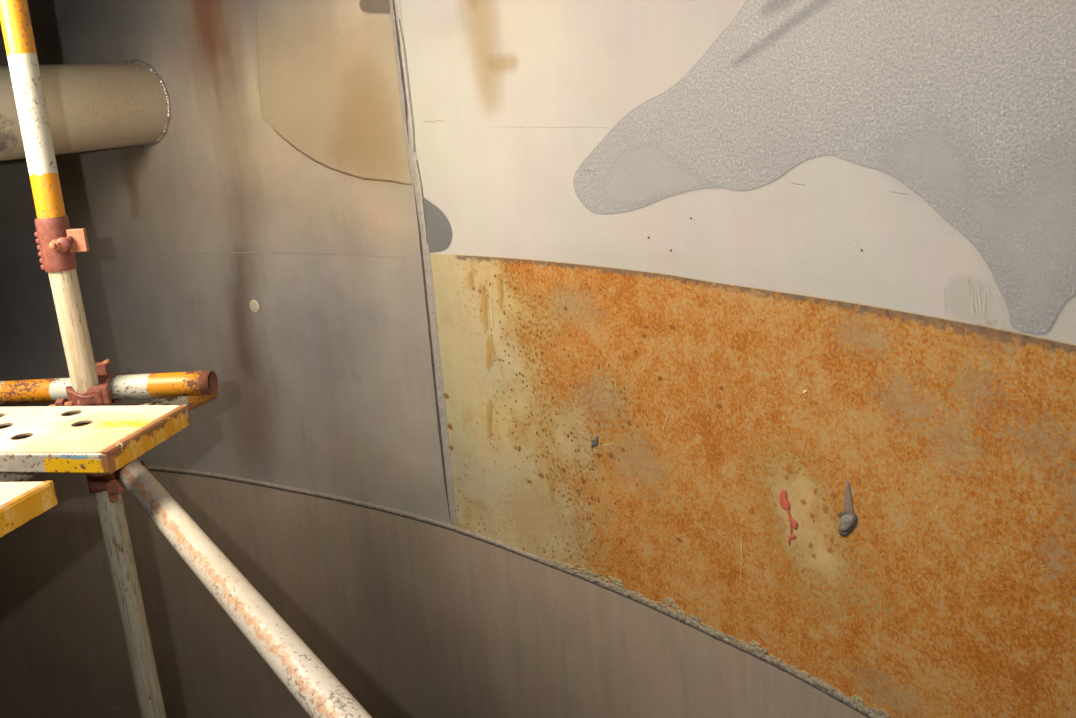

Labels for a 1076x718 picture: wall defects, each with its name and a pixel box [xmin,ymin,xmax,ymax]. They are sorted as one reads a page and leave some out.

rust [456,255,1076,718]